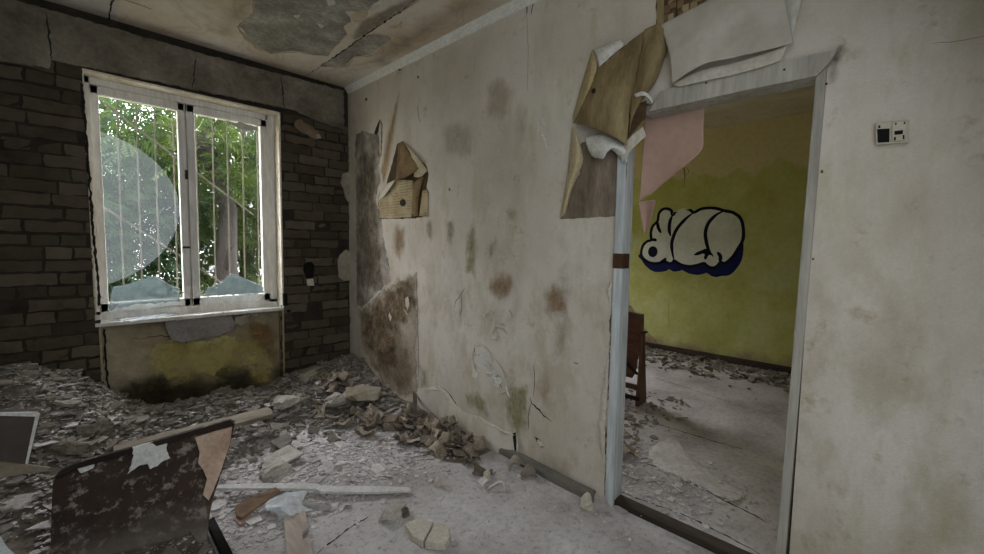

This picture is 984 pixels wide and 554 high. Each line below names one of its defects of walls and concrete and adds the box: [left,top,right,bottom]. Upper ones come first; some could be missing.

crack [107,0,150,19]
peeling [237,0,402,68]
flaking render [355,120,417,395]
leakage [126,324,275,404]
flaking render [637,330,791,400]